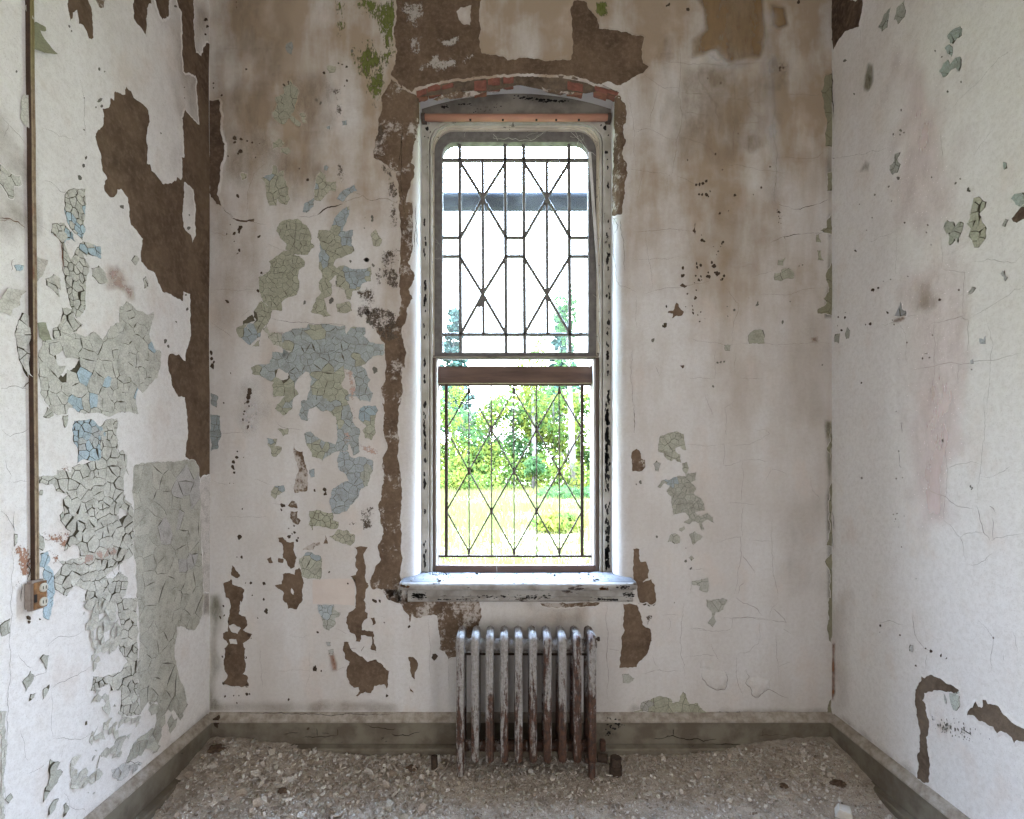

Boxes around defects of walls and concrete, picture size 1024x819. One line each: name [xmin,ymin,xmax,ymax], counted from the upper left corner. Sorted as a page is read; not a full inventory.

leakage [695,0,787,62]
peeling [934,24,964,93]
peeling [943,178,1024,250]
flaking render [0,0,659,819]
peeling [629,430,729,628]
peeling [633,691,720,713]
flaking render [899,634,1024,786]